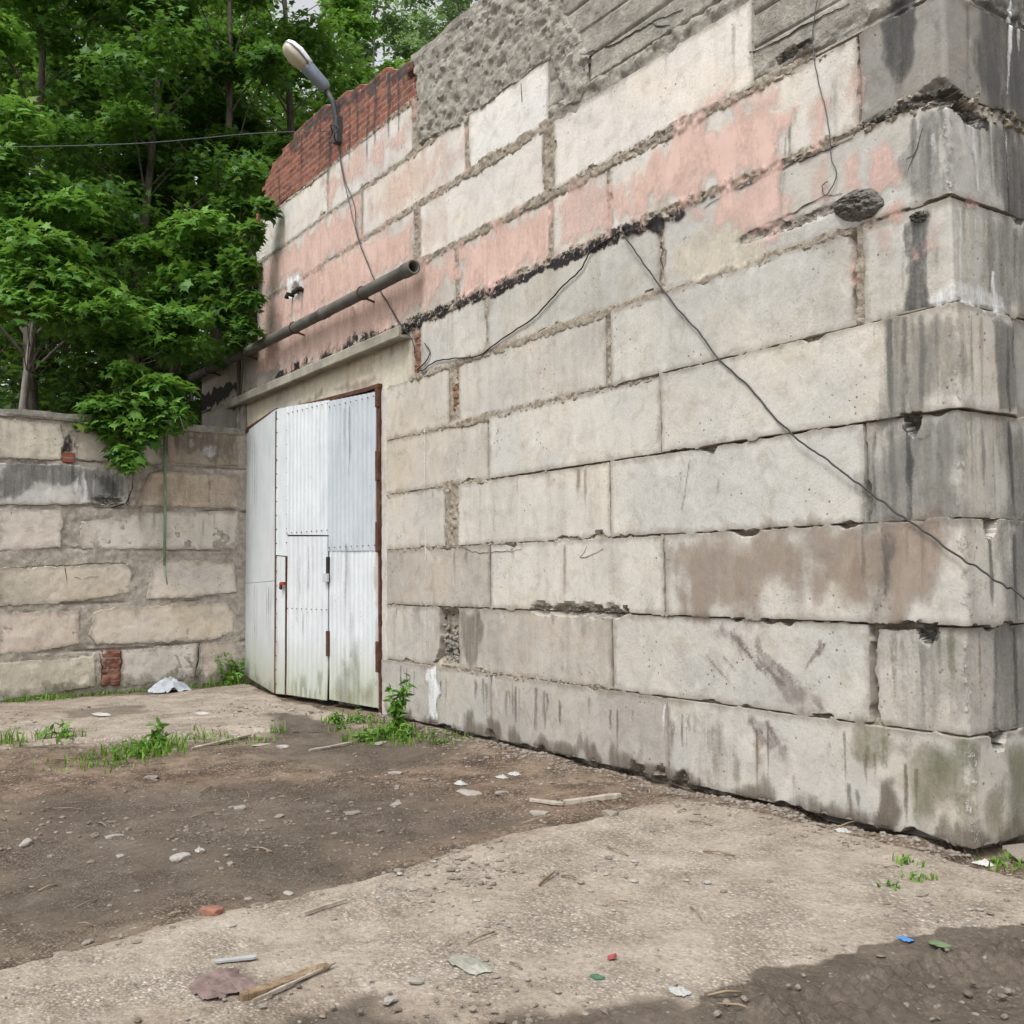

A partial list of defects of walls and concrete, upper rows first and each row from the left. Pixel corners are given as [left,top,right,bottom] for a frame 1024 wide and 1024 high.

damp [881,0,917,75]
damp [978,0,1024,110]
spalling [857,84,989,187]
peeling [257,198,552,373]
damp [275,209,685,379]
damp [886,212,1024,414]
damp [201,382,237,412]
damp [3,461,126,503]
spalling [531,603,629,618]
spalling [916,619,945,644]
damp [426,667,441,719]
damp [878,765,907,827]